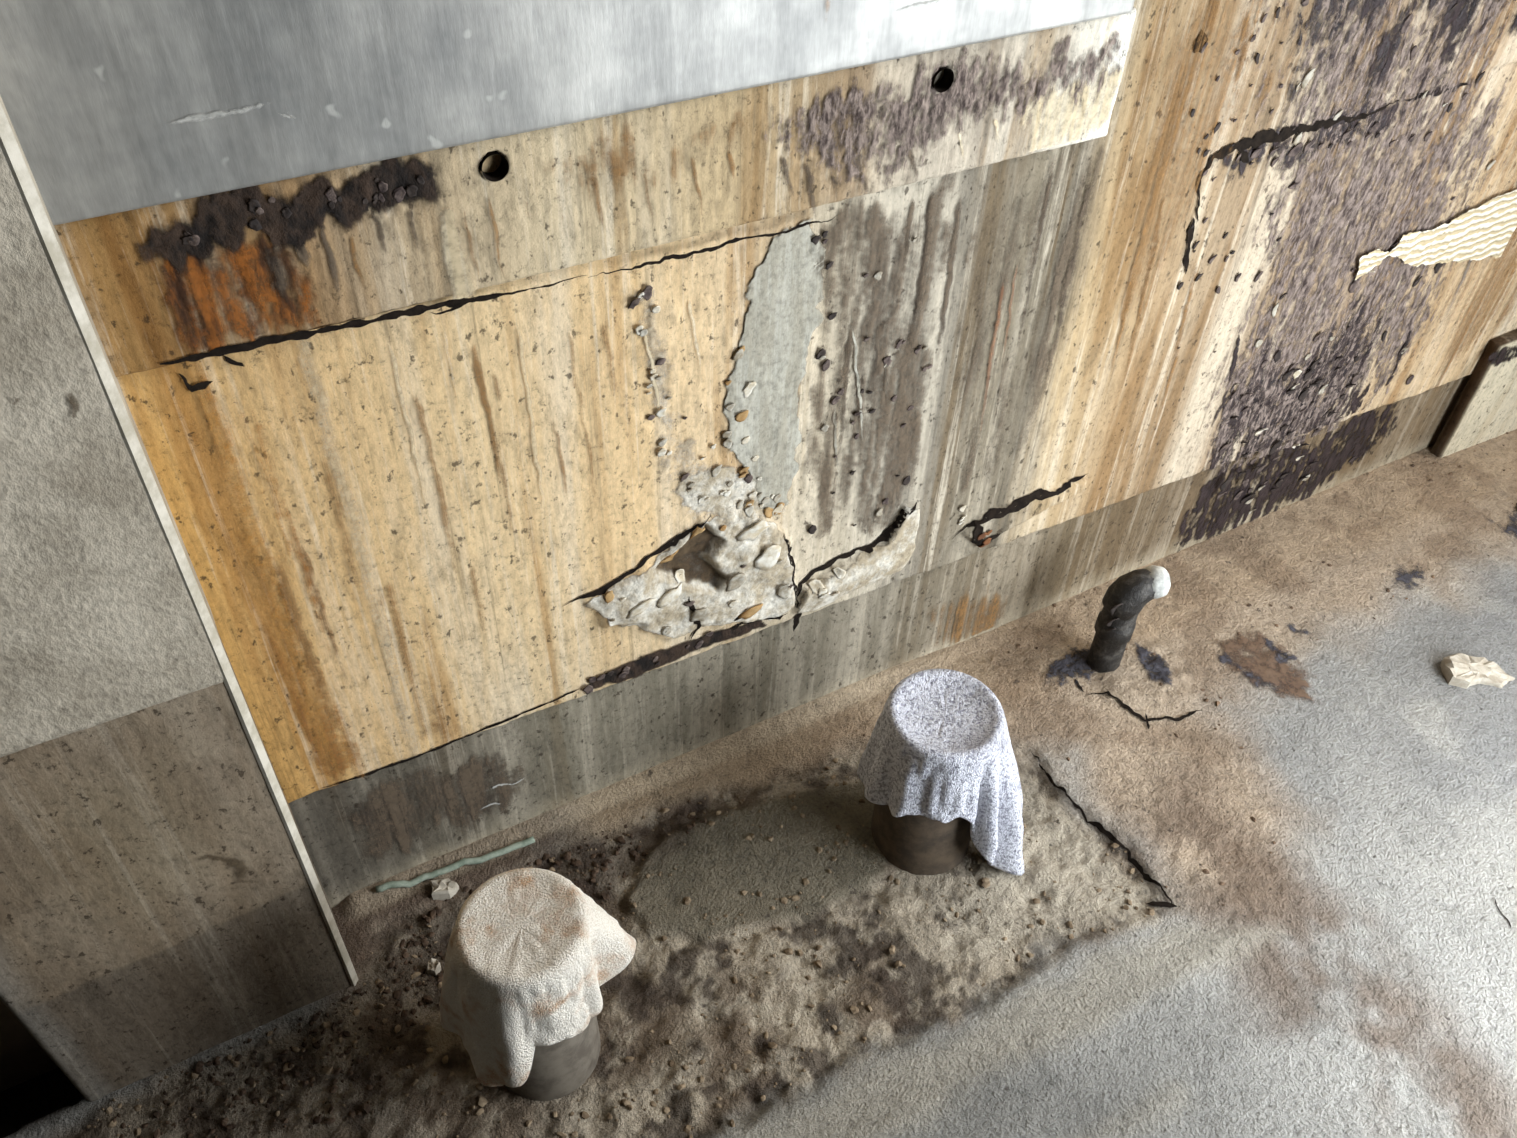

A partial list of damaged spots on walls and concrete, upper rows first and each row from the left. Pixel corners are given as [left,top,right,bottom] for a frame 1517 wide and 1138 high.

rust [152,234,319,354]
crack [160,214,839,392]
peeling [564,219,826,639]
peeling [852,332,863,428]
water stain [764,33,1124,536]
water stain [1113,0,1517,551]
peeling [1355,190,1517,280]
crack [954,474,1086,548]
crack [1031,752,1177,908]